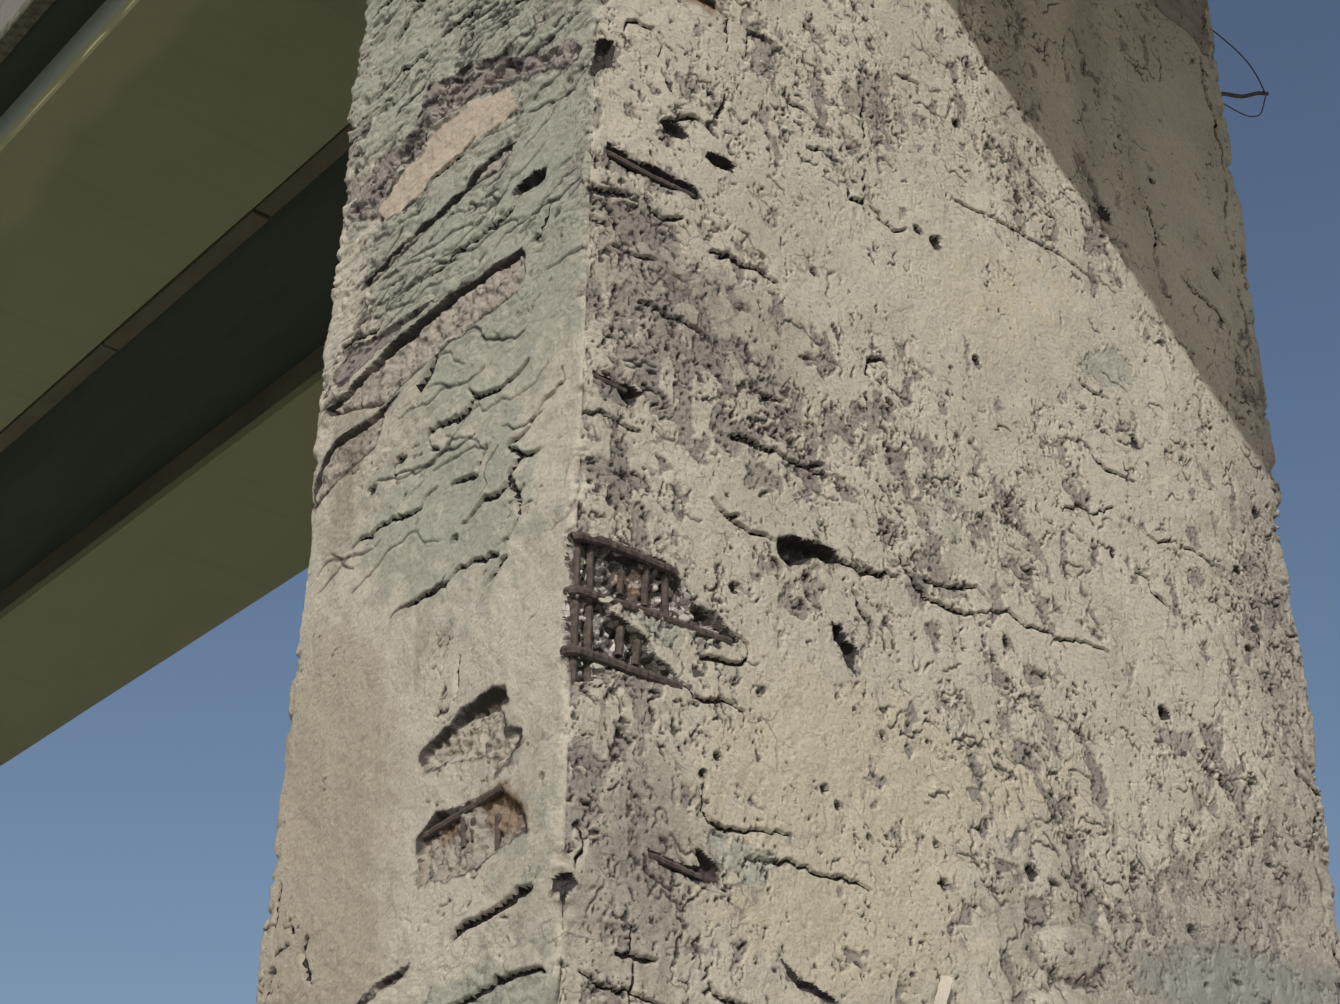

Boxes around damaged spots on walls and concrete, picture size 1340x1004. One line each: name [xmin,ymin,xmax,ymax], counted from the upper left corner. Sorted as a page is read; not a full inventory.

spalling [346,38,616,222]
crack [623,21,745,125]
crack [712,7,904,233]
spalling [361,143,516,291]
crack [394,359,525,484]
crack [361,434,535,607]
spalling [560,529,742,689]
spalling [776,535,838,567]
crack [830,557,1107,653]
spalling [410,685,527,889]
crack [454,885,533,941]
crack [458,926,654,1004]